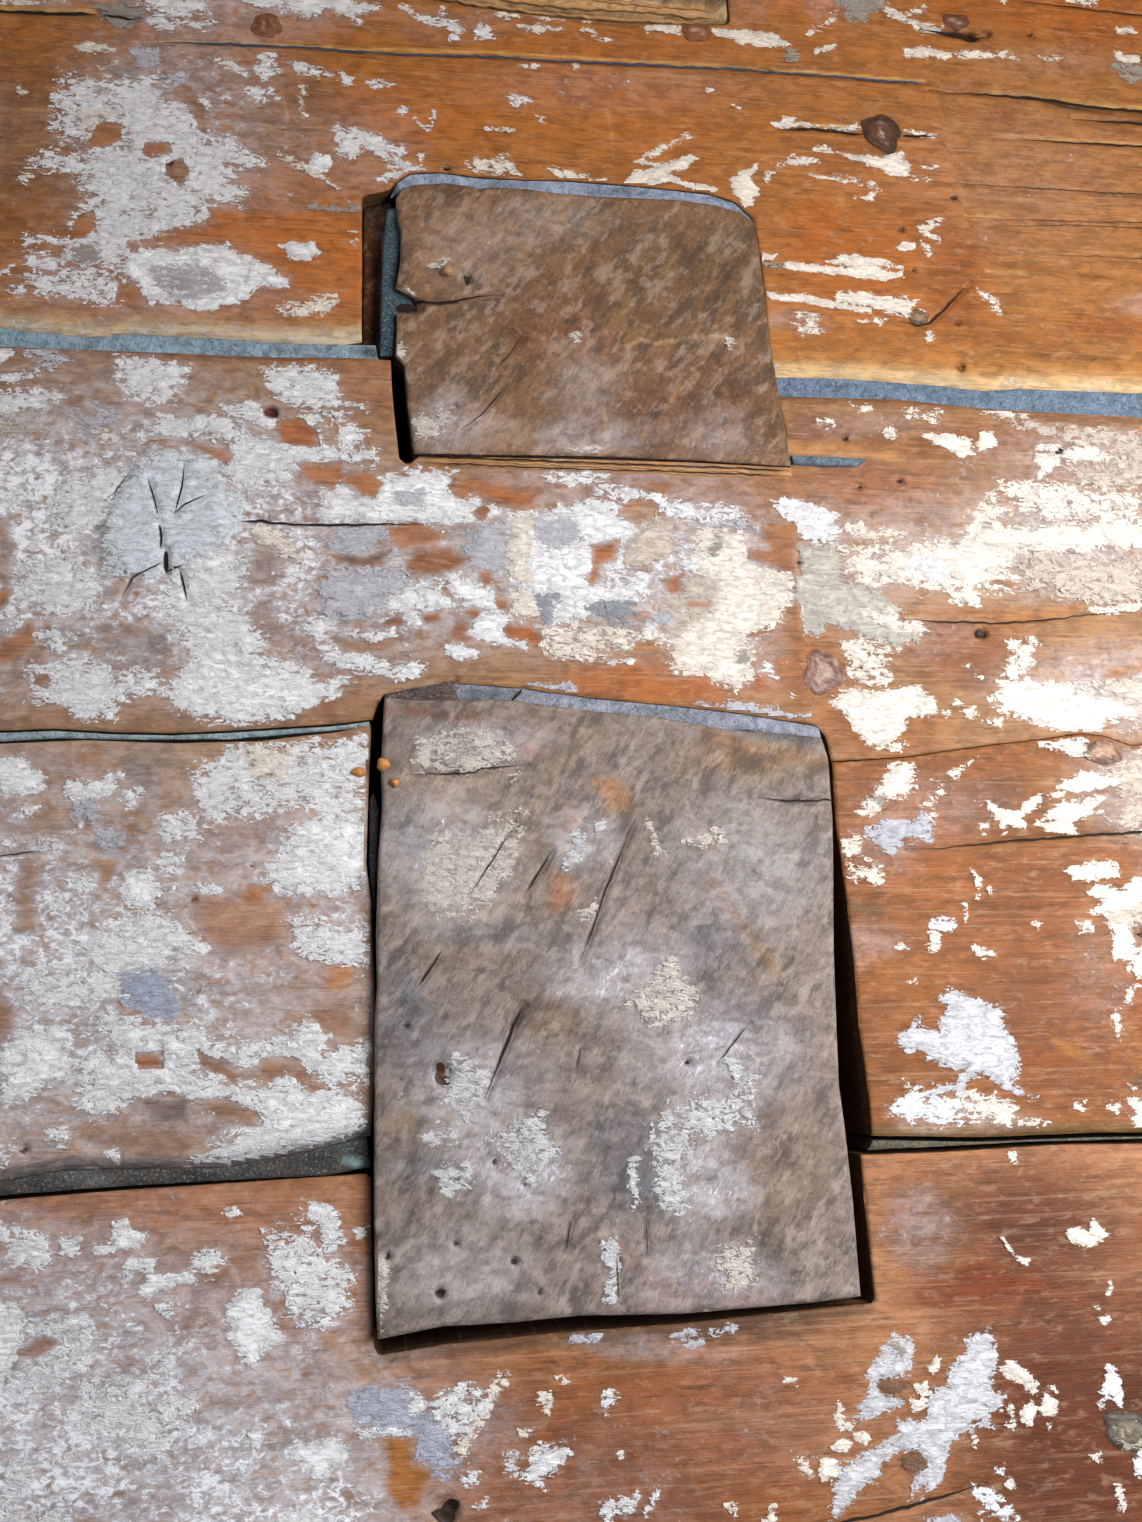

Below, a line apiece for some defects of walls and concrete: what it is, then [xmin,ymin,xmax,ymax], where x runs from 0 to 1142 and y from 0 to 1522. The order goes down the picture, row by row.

peeling [711,0,1019,63]
peeling [0,0,427,318]
peeling [548,115,939,208]
peeling [762,214,943,336]
crack [114,463,207,602]
peeling [0,348,1142,1166]
peeling [0,1217,227,1462]
peeling [220,1196,370,1369]
peeling [1065,1218,1110,1248]
peeling [282,1369,510,1514]
peeling [790,1327,1059,1522]
peeling [1088,1363,1142,1513]